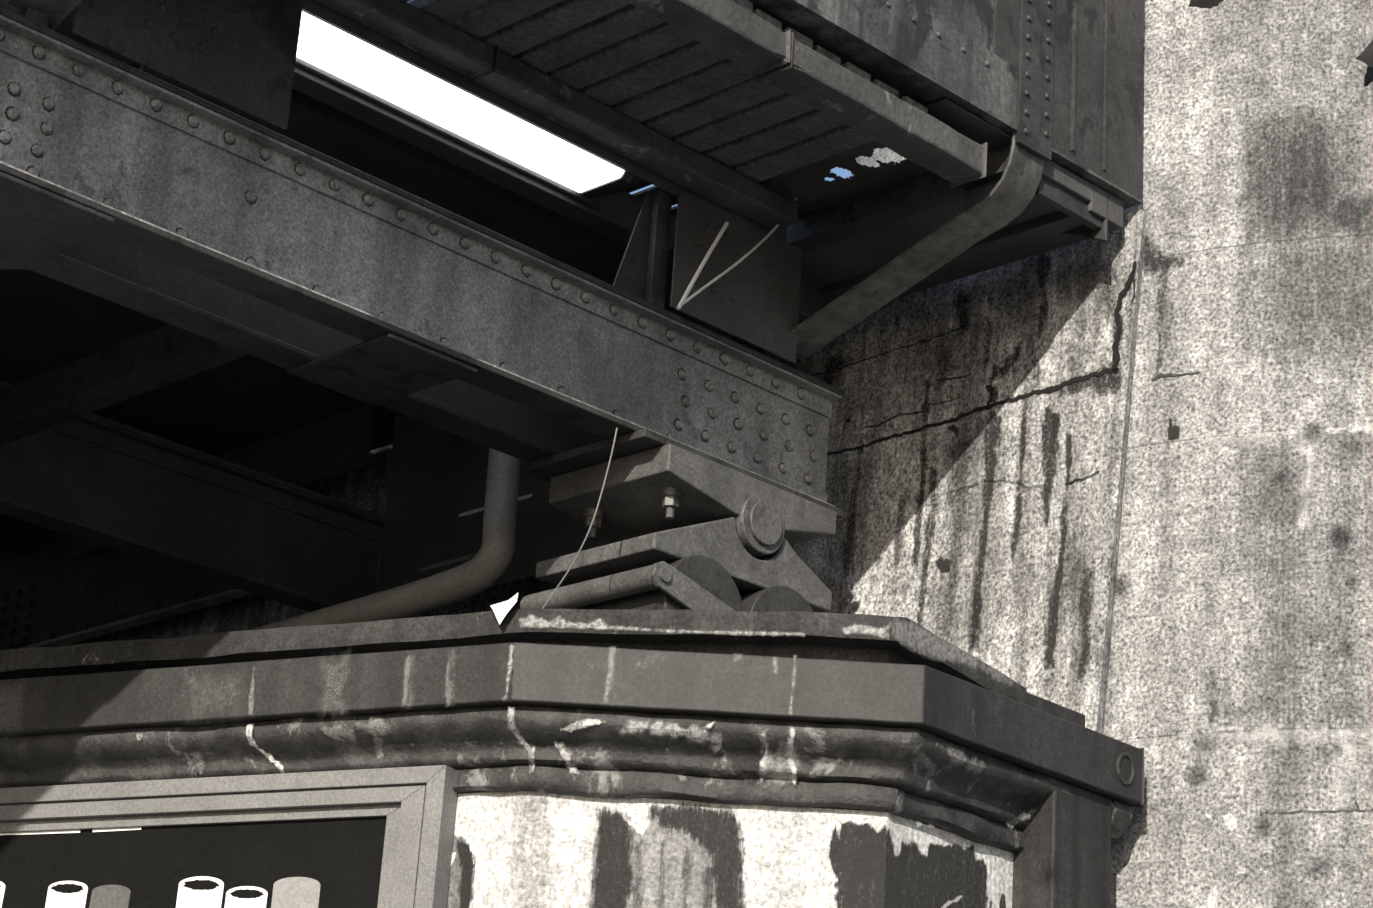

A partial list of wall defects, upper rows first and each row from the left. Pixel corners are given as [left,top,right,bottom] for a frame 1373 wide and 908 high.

crack [811,235,1200,455]
damp [842,405,865,577]
damp [895,379,937,625]
damp [953,253,1072,669]
damp [1078,570,1094,678]
peeling [592,804,745,908]
peeling [829,821,1006,908]